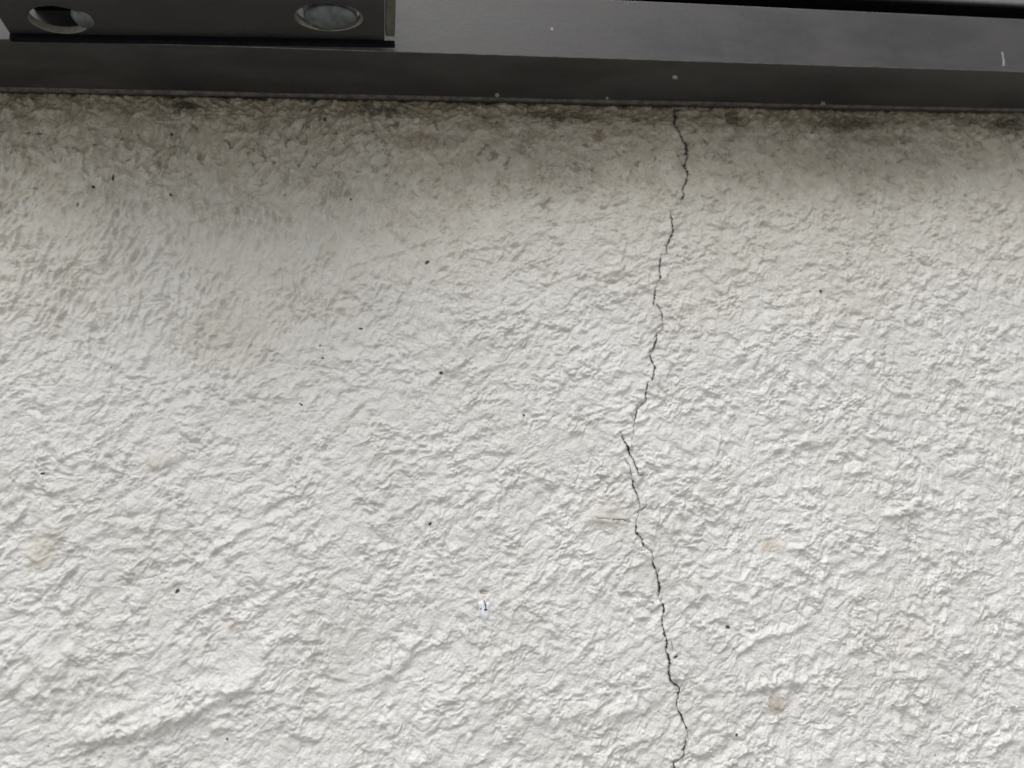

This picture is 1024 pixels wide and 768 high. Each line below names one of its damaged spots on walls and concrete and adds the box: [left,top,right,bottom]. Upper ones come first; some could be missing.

crack [596,108,695,768]